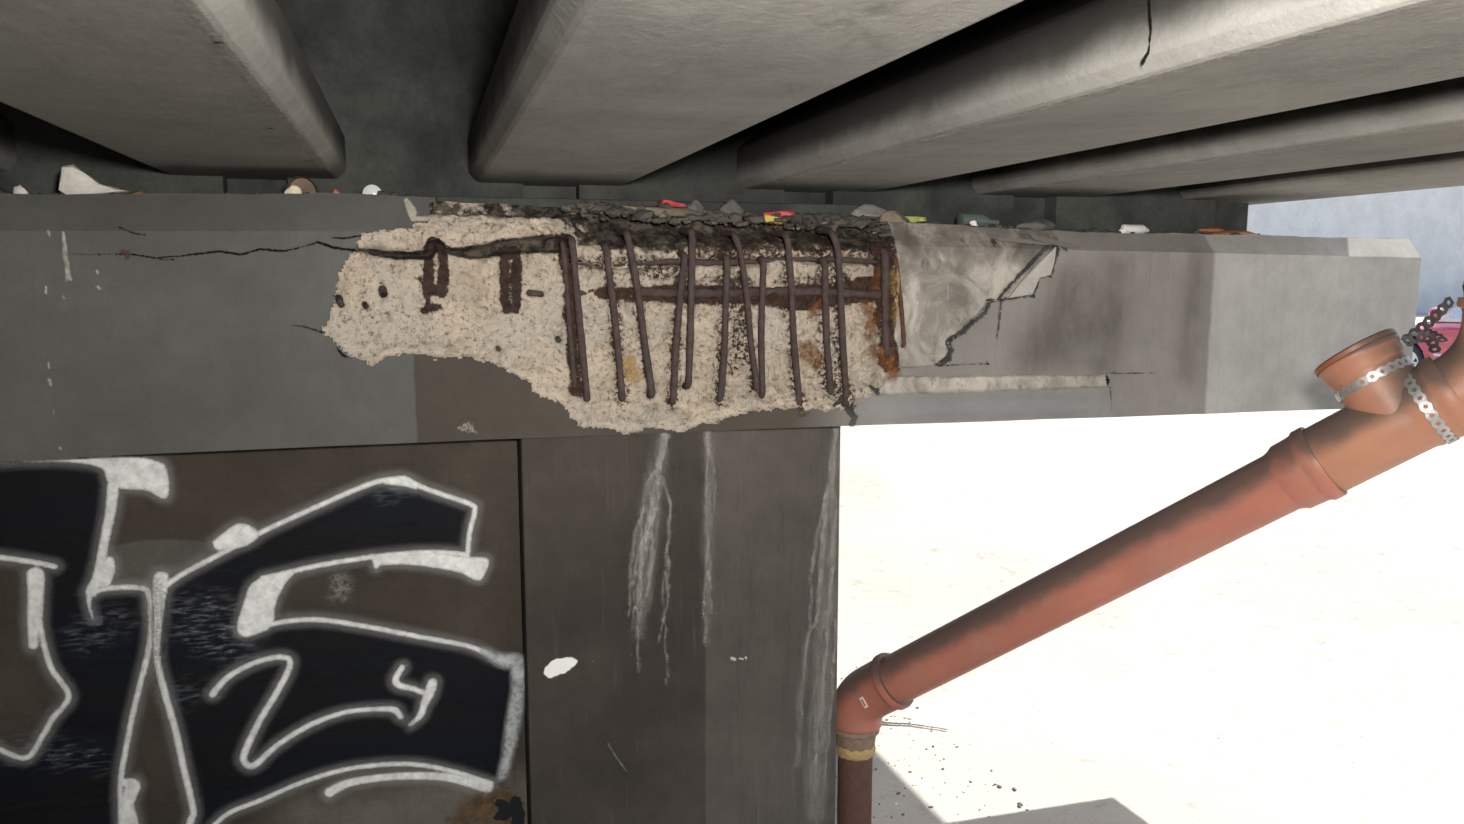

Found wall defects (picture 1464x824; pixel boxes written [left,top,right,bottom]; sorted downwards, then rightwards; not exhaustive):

crack [98,227,362,260]
spalling [322,198,1114,435]
corrosion [553,227,900,416]
crack [935,245,1067,367]